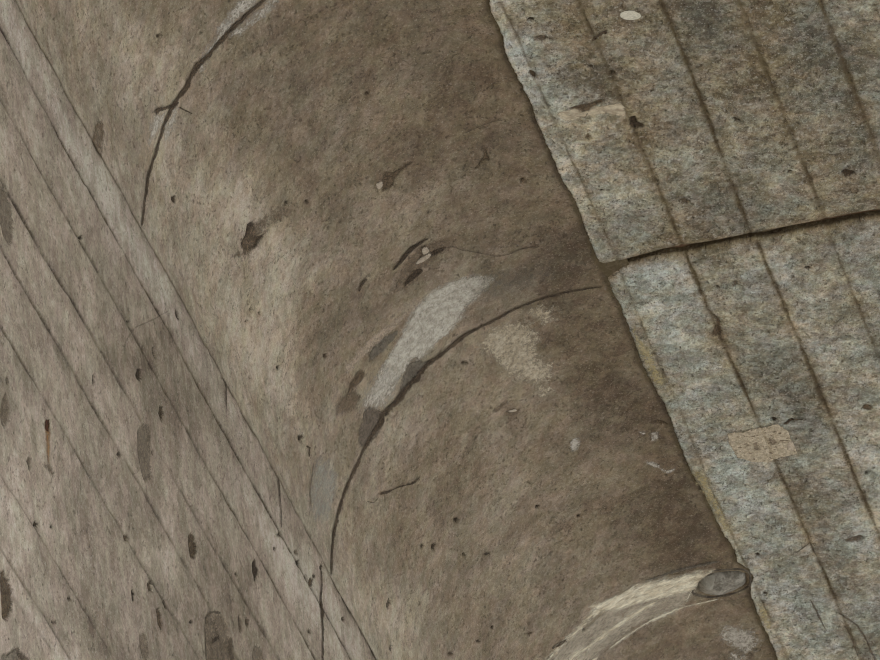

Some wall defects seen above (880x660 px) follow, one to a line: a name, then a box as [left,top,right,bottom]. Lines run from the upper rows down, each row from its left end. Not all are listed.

crack [142,0,266,225]
damp [337,276,494,446]
corrosion [45,420,54,474]
crack [319,287,601,660]
damp [548,561,717,660]